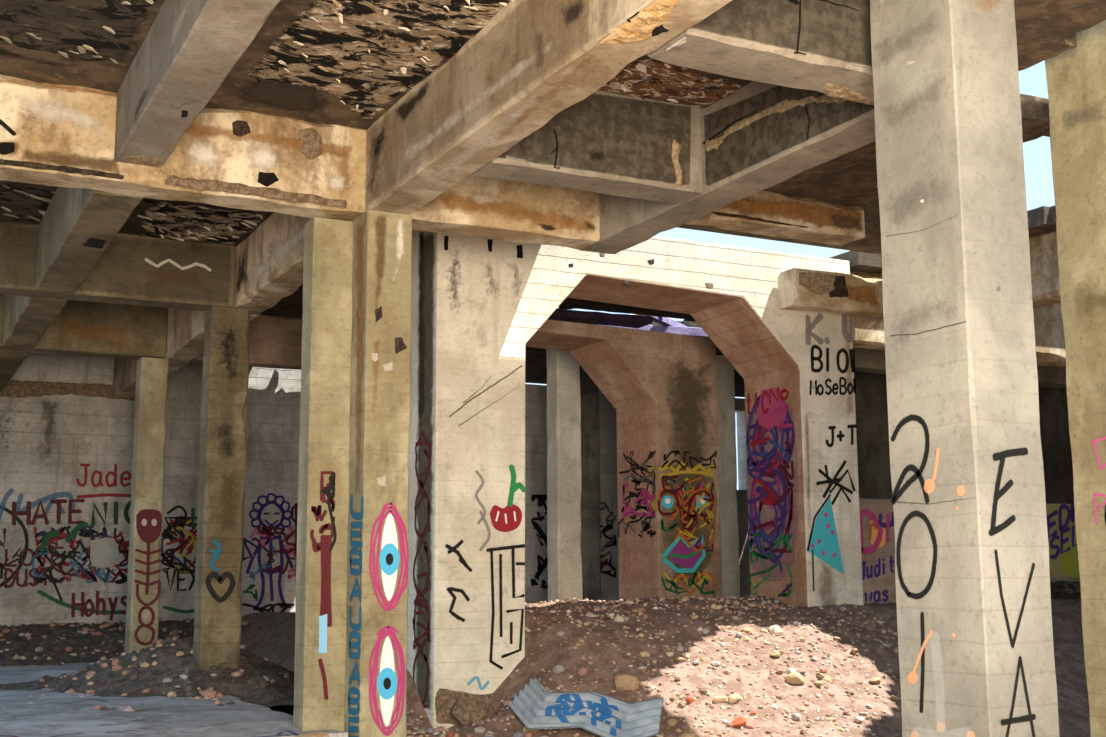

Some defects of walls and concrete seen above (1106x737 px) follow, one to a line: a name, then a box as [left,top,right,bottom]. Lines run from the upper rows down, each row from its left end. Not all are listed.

peeling [0,0,157,65]
spalling [599,0,679,44]
peeling [241,0,514,119]
peeling [599,37,742,110]
crack [0,119,16,136]
spalling [0,142,124,179]
spalling [125,155,162,166]
peeling [0,183,55,222]
peeling [138,200,265,245]
spalling [165,172,347,208]